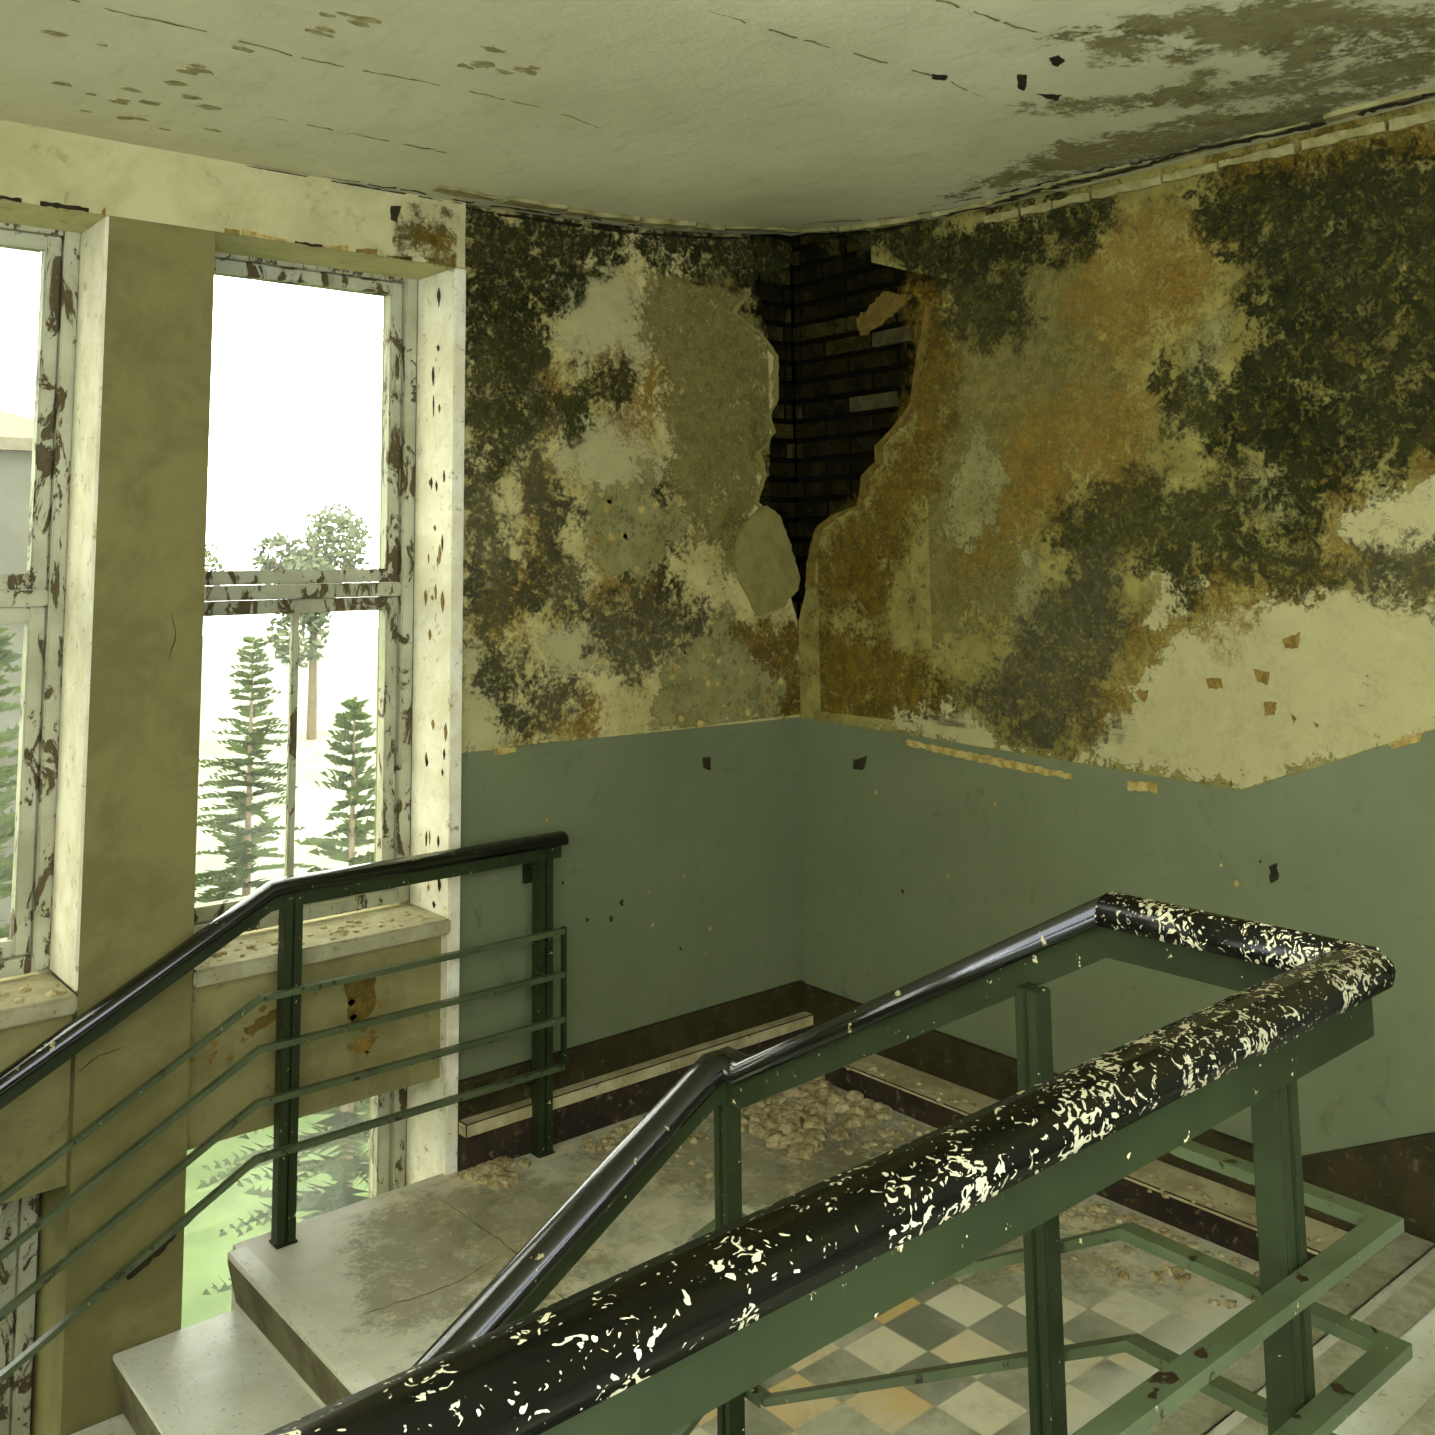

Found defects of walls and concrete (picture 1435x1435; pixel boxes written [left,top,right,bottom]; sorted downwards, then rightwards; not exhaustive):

peeling [304,11,382,38]
peeling [457,45,540,76]
flaking render [1049,55,1065,67]
peeling [51,81,170,131]
peeling [163,64,222,110]
flaking render [1017,74,1062,101]
leakage [819,0,1435,358]
flaking render [433,86,1435,731]
leakage [965,134,1435,751]
peeling [428,525,443,567]
peeling [424,584,445,613]
peeling [425,633,530,776]